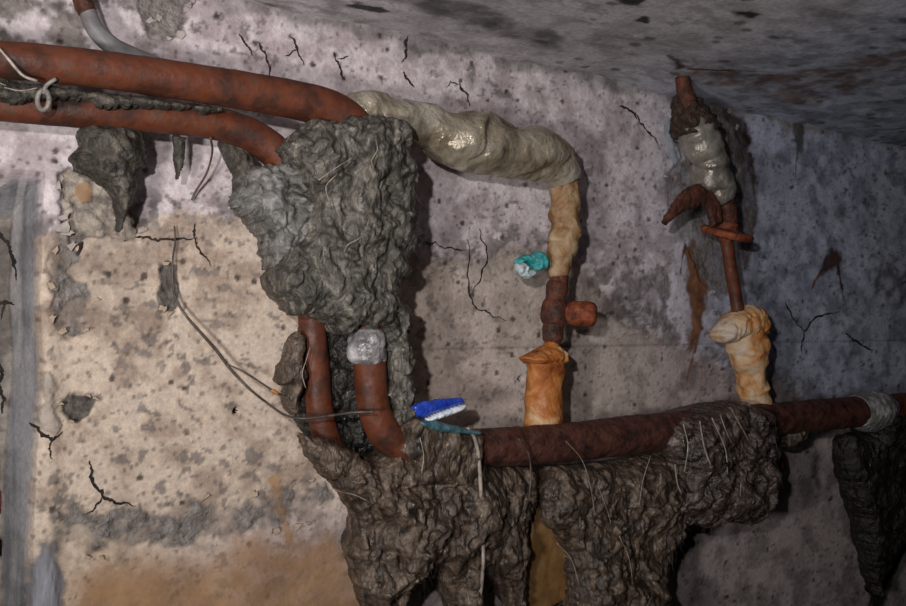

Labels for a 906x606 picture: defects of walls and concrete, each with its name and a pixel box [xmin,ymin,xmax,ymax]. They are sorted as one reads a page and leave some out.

crack [0,232,17,280]
spalling [47,166,148,337]
crack [0,300,14,319]
rust [680,240,708,378]
crack [0,364,8,414]
peeling [36,372,100,435]
crack [29,422,63,459]
crack [84,461,134,515]